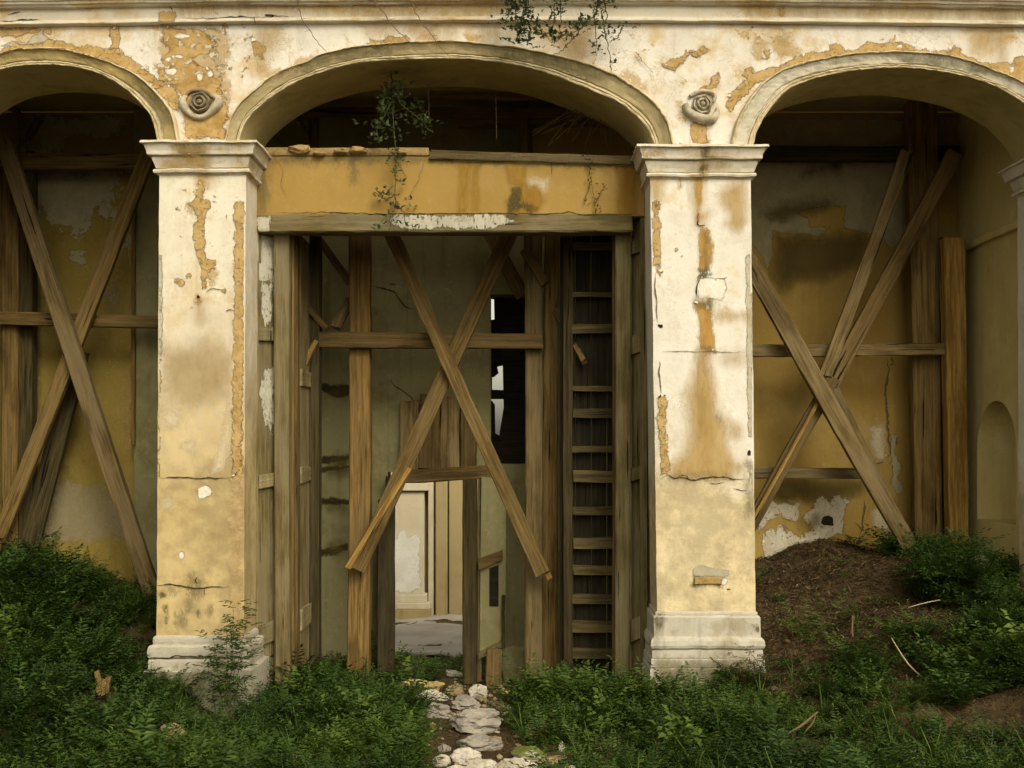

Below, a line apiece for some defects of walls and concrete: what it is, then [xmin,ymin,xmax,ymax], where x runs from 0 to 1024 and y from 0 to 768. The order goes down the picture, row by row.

peeling [0,11,266,140]
peeling [662,46,710,71]
peeling [726,26,1024,111]
peeling [389,213,514,231]
peeling [694,269,727,353]
peeling [157,174,274,637]
crack [166,471,238,479]
crack [664,474,746,491]
peeling [758,495,850,557]
crack [156,577,228,595]
flaking render [693,576,727,587]